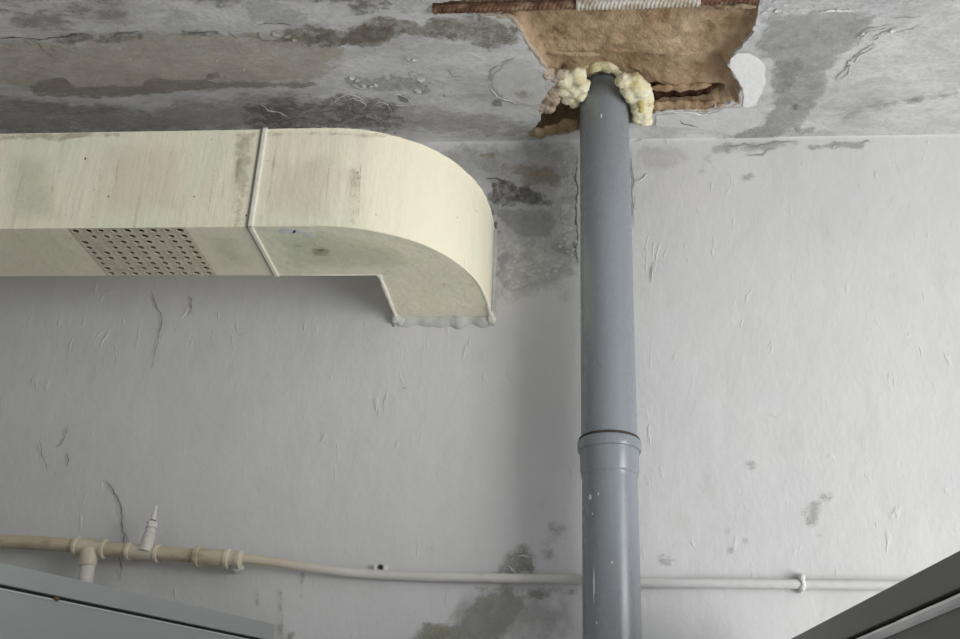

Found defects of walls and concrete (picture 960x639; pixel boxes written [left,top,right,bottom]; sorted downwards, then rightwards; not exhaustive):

leakage [0,0,142,44]
leakage [282,0,517,49]
leakage [0,73,525,137]
peeling [345,73,431,103]
spalling [476,12,600,115]
spalling [651,82,711,93]
leakage [716,9,875,155]
leakage [486,177,551,226]
crack [150,292,162,369]
crack [105,480,129,578]
leakage [506,550,534,574]
leakage [416,587,521,639]